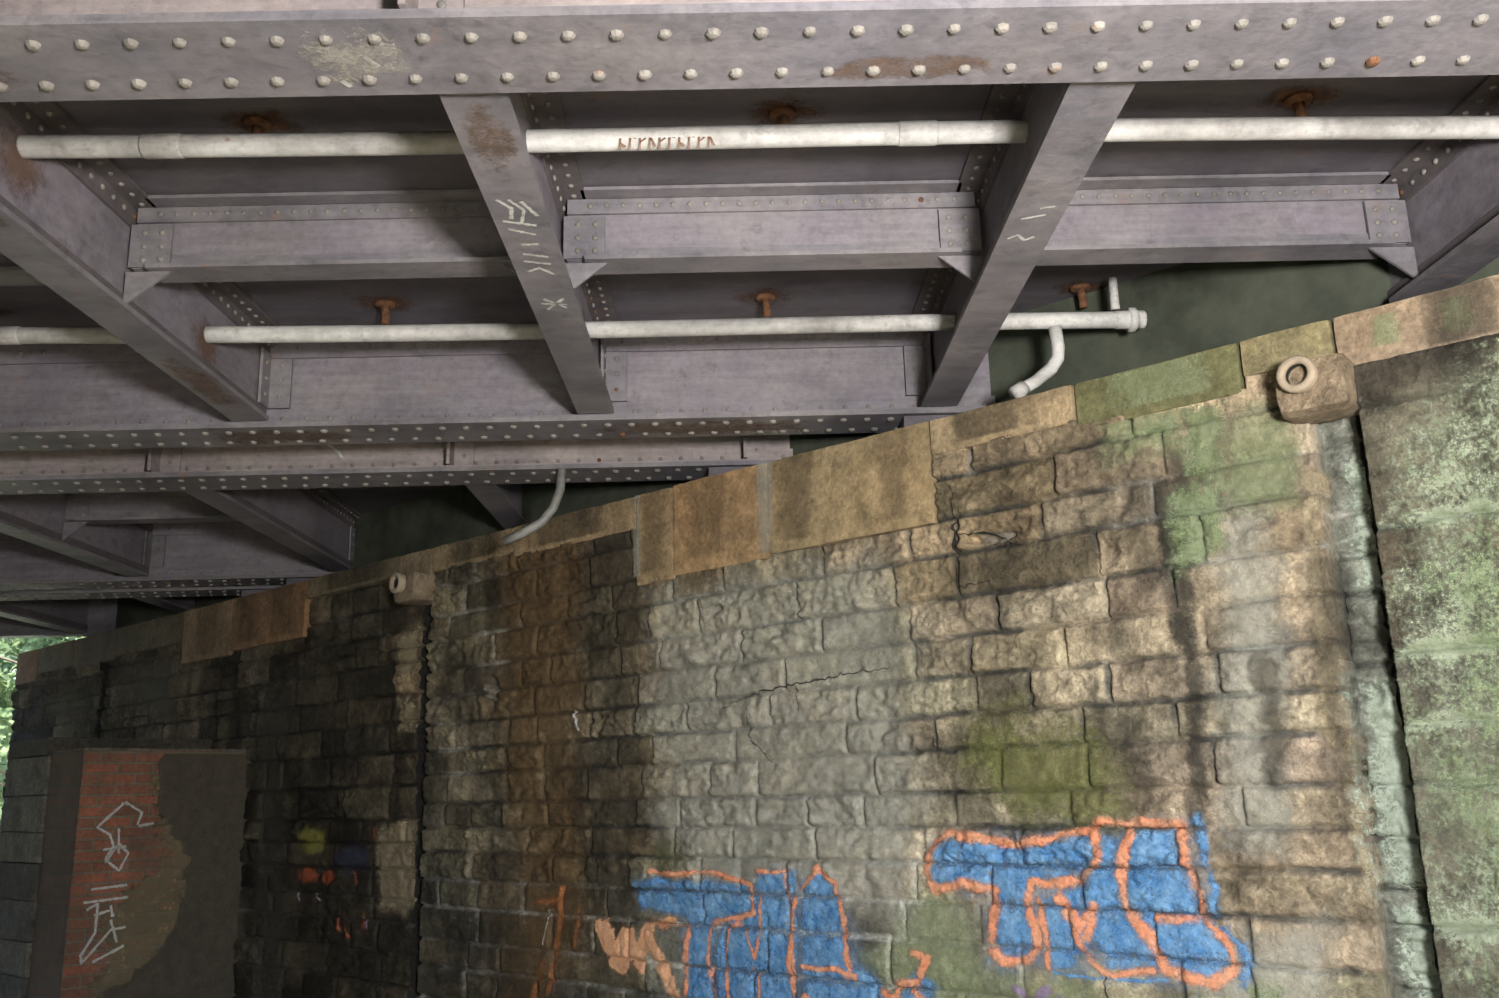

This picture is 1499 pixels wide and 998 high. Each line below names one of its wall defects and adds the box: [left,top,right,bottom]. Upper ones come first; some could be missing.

rust [833,57,984,79]
peeling [87,754,251,998]